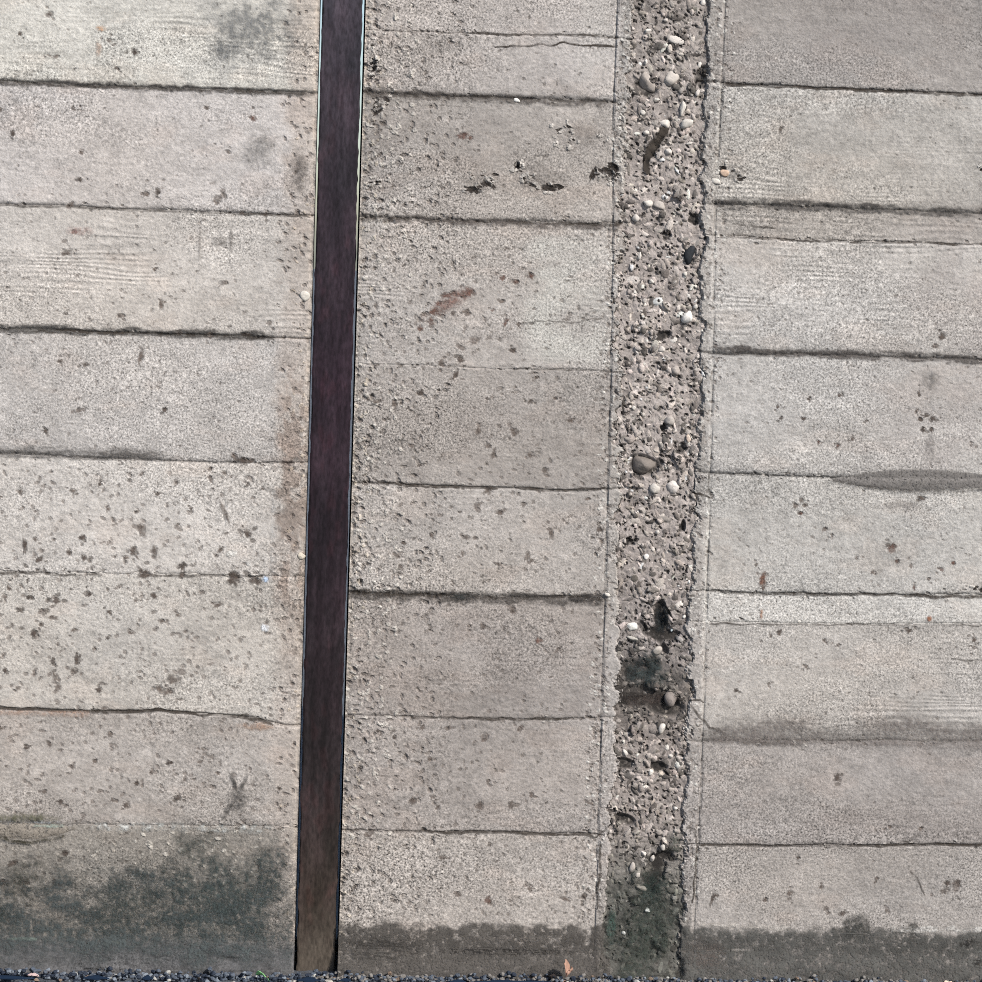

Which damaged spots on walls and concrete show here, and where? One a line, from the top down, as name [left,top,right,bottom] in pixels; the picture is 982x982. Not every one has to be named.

spalling [510,162,564,195]
water stain [337,922,610,982]
water stain [680,917,982,982]